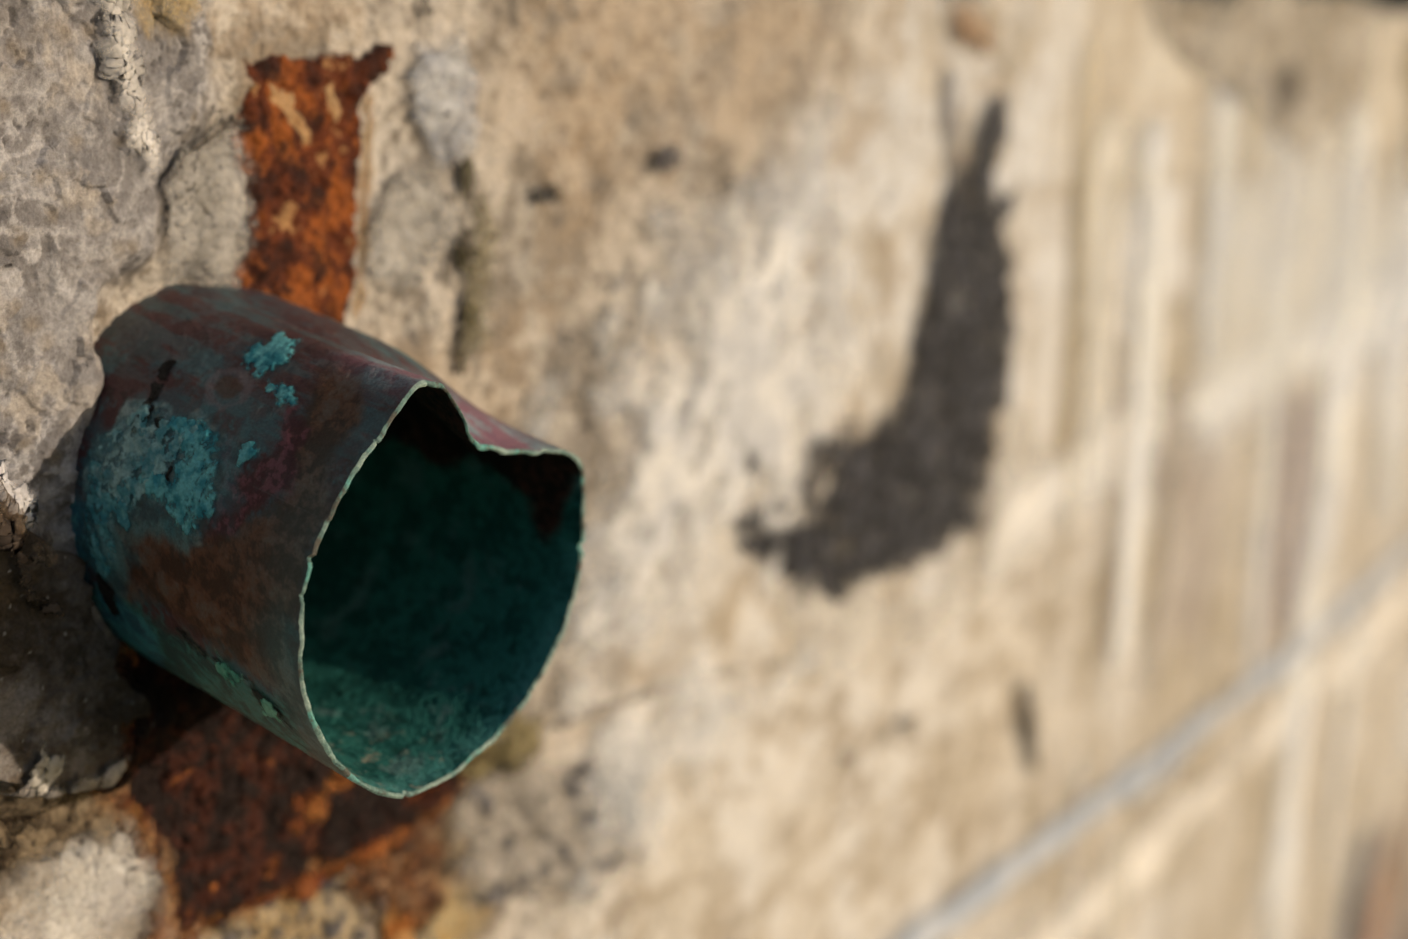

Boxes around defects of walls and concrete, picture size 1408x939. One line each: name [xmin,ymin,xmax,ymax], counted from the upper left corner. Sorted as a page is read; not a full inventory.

rust [94,646,491,939]